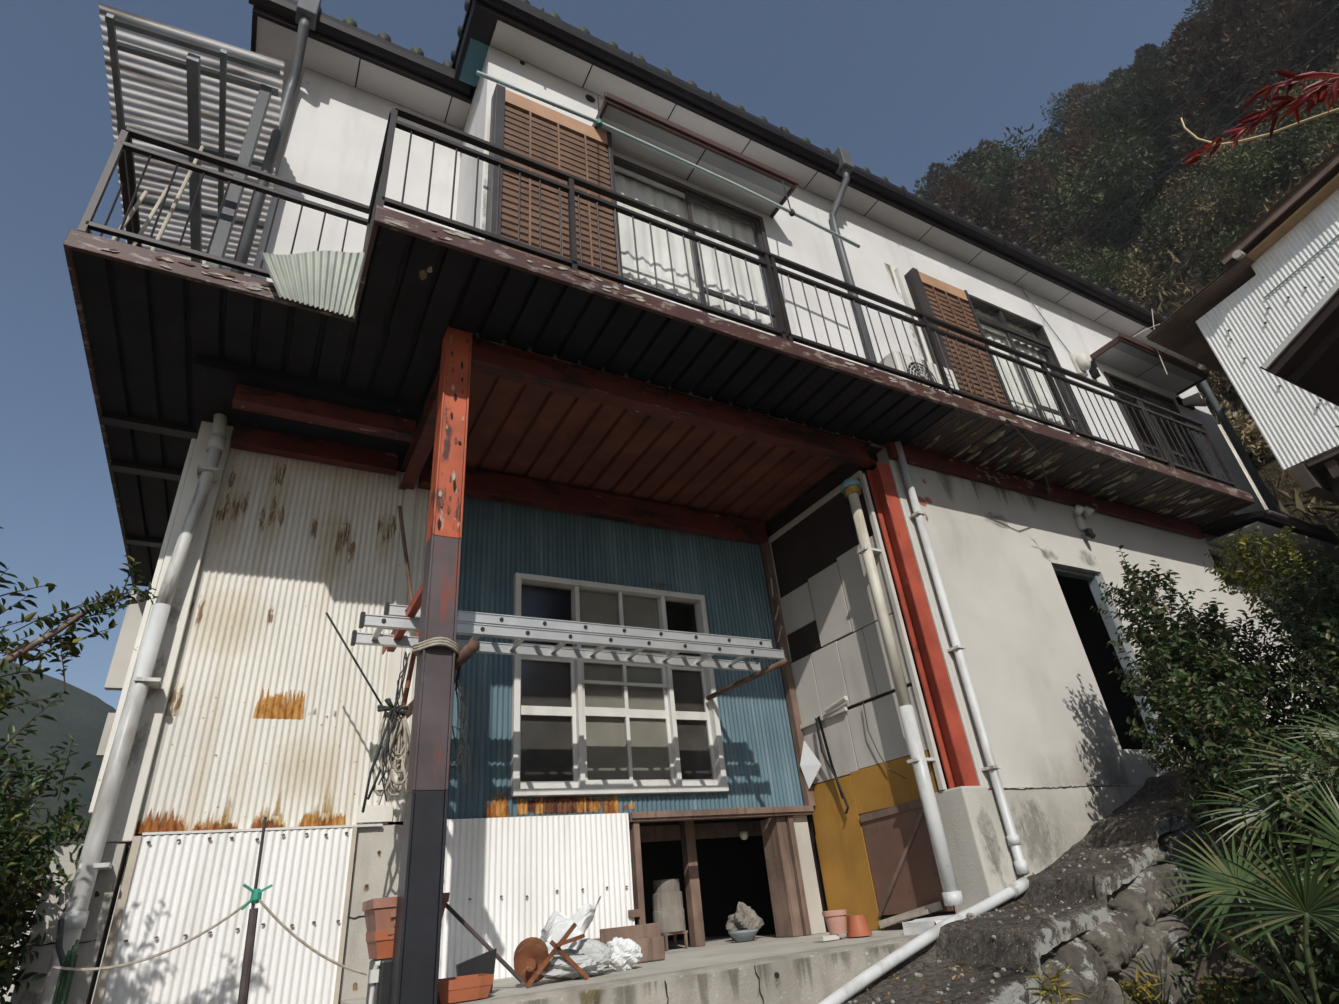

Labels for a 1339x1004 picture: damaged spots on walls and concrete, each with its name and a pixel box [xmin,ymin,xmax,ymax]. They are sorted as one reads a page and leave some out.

rust [216,461,286,533]
rust [335,522,356,563]
rust [189,587,205,626]
rust [253,689,336,720]
rust [135,797,346,834]